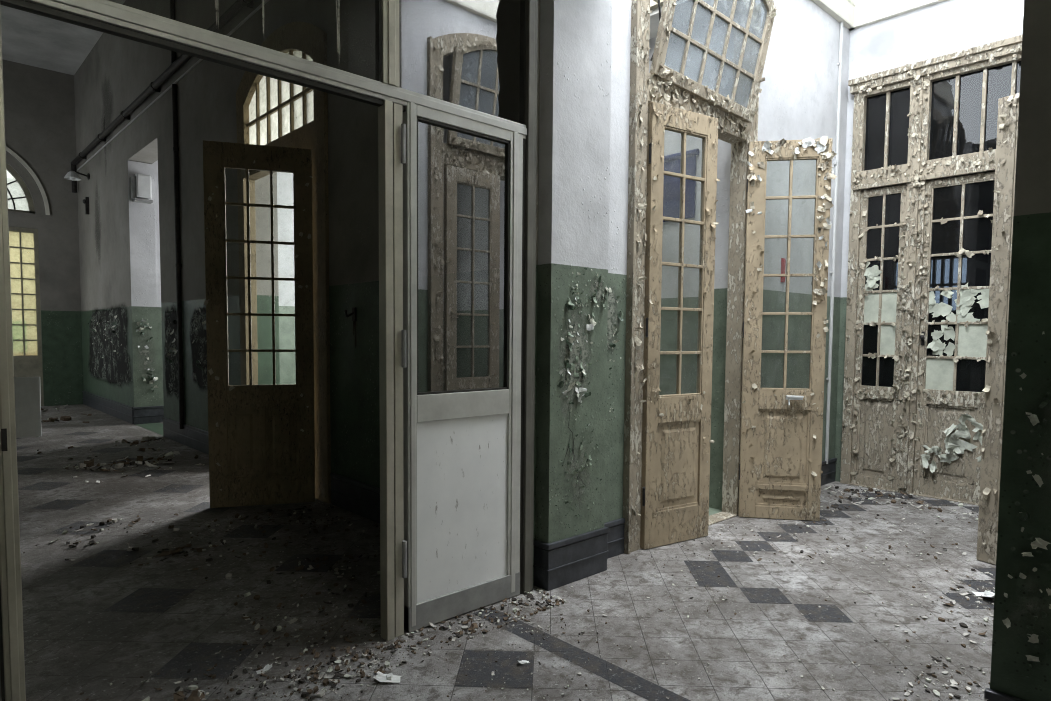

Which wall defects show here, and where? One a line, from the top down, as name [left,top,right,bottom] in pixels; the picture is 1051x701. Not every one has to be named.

peeling [638,0,837,246]
peeling [636,203,657,260]
peeling [811,260,828,305]
peeling [841,0,1024,480]
peeling [88,300,224,398]
peeling [554,268,624,528]
peeling [634,299,664,416]
peeling [1008,507,1051,579]
peeling [1026,585,1051,678]